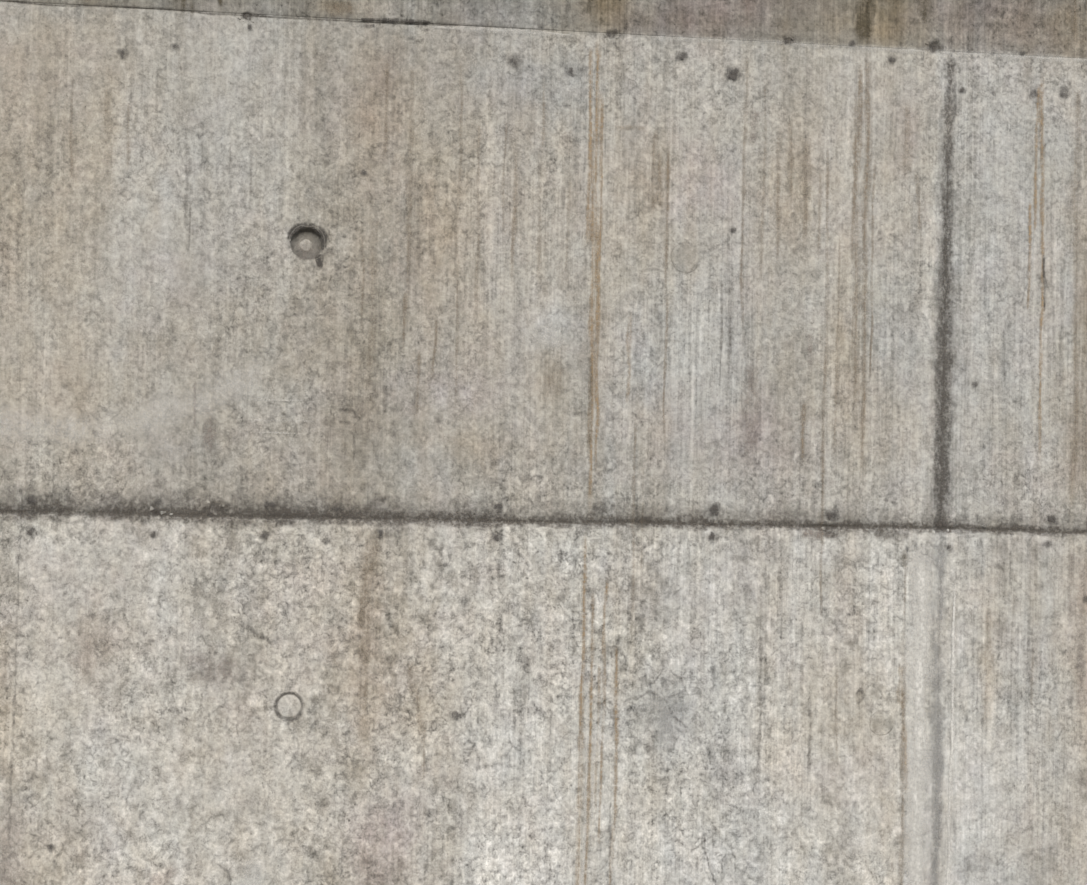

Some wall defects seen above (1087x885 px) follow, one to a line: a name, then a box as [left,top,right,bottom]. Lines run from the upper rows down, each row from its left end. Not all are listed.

water stain [0,506,66,518]
water stain [89,182,1086,536]
corrosion [580,555,602,783]
corrosion [587,55,603,484]